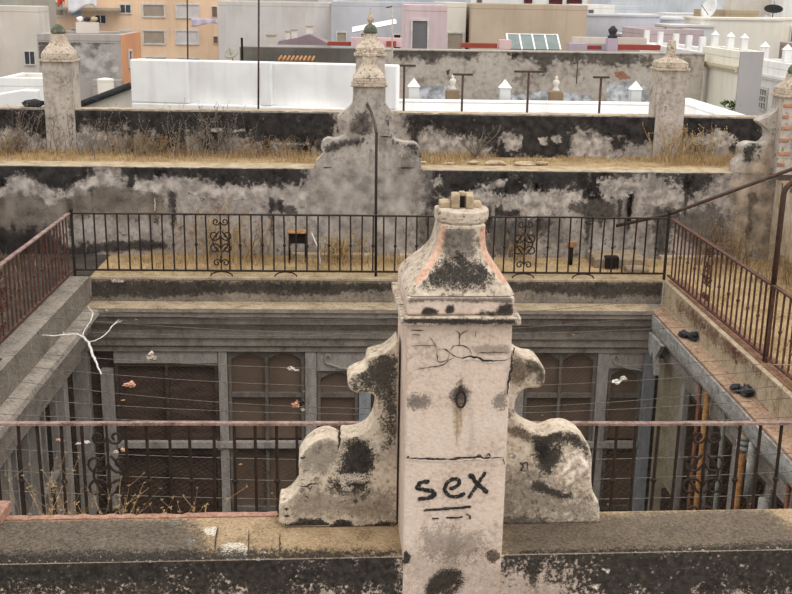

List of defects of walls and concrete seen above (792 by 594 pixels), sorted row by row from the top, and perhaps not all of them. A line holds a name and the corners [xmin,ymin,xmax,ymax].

peeling [606,71,649,102]
water stain [386,114,775,256]
crack [412,330,515,398]
water stain [326,351,398,504]
water stain [507,425,591,500]
water stain [0,519,411,594]
water stain [486,509,792,594]